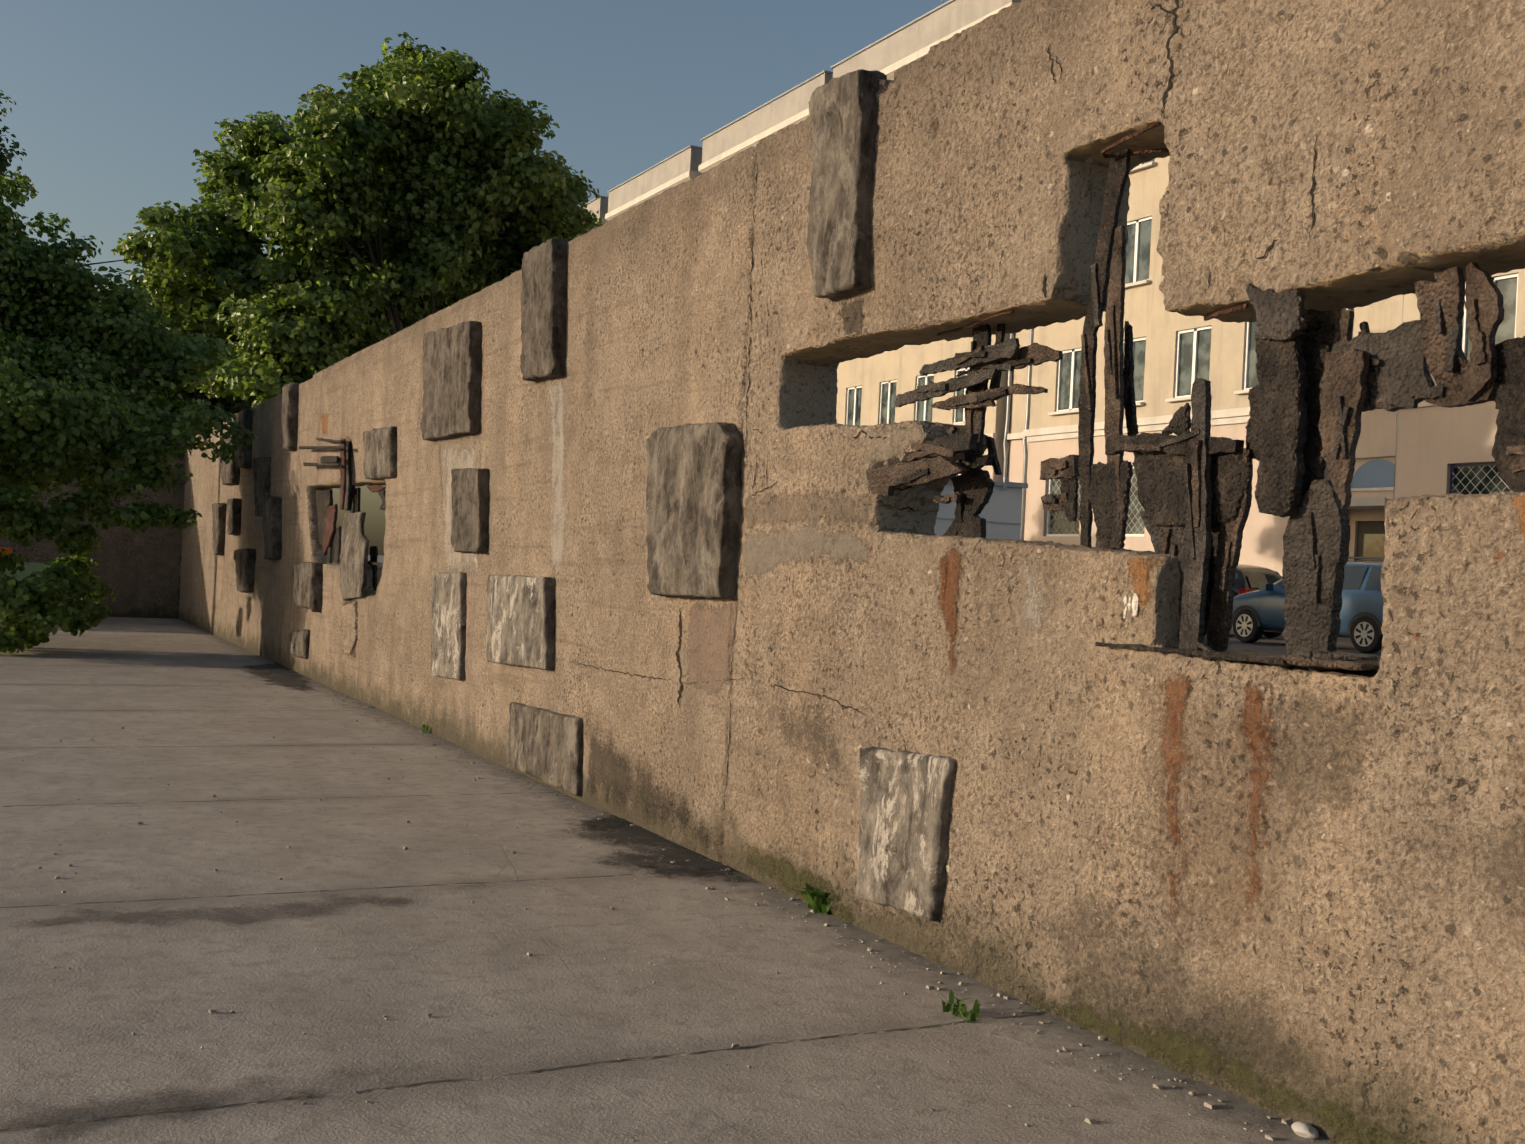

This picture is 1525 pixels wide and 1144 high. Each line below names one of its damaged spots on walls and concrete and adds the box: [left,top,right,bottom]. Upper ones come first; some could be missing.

crack [1150,0,1178,119]
crack [745,145,778,497]
damp [567,723,718,849]
damp [607,862,731,880]
crack [570,610,863,807]
corrosion [937,548,962,675]
corrosion [1158,673,1192,927]
corrosion [1235,683,1273,907]